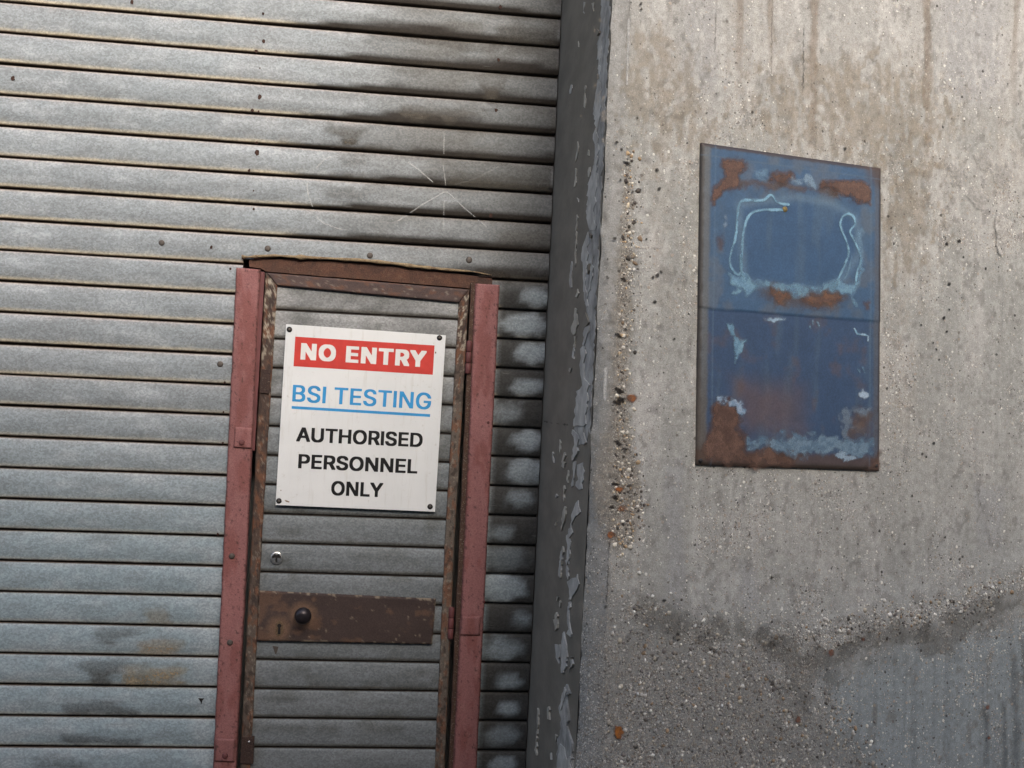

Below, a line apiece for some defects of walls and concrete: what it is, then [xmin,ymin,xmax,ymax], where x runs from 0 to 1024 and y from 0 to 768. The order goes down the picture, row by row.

rust [711,159,747,205]
rust [819,180,871,204]
peeling [724,194,864,303]
peeling [534,0,662,768]
rust [703,398,793,471]